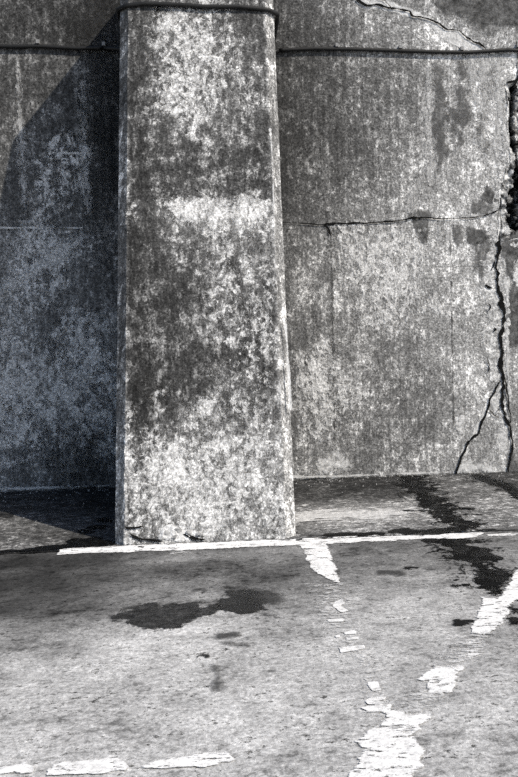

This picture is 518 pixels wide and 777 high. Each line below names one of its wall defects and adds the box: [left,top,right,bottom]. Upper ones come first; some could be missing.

crack [356,0,486,50]
crack [282,206,498,441]
damp [330,54,506,334]
crack [451,239,518,474]
spalling [479,80,518,381]
damp [501,231,518,347]